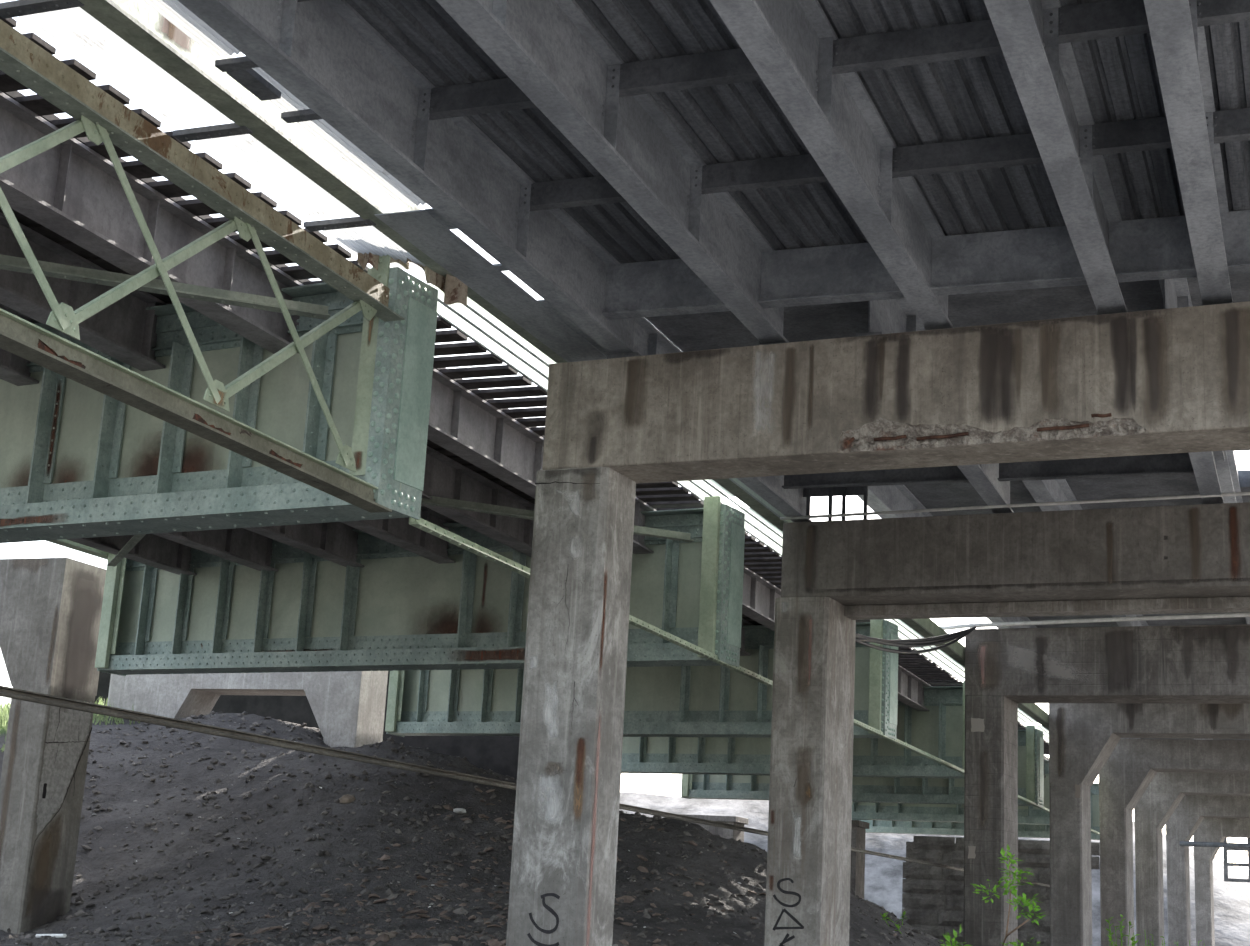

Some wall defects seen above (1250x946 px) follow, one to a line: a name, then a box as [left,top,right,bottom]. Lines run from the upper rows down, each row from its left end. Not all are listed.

corrosion [162,18,190,50]
leakage [859,310,1165,418]
leakage [1226,310,1249,413]
leakage [626,360,643,424]
leakage [754,349,793,439]
corrosion [133,451,160,477]
corrosion [181,446,211,473]
spalling [838,413,1145,453]
corrosion [0,514,57,527]
corrosion [462,648,525,661]
leakage [1036,637,1046,691]
corrosion [547,722,600,946]